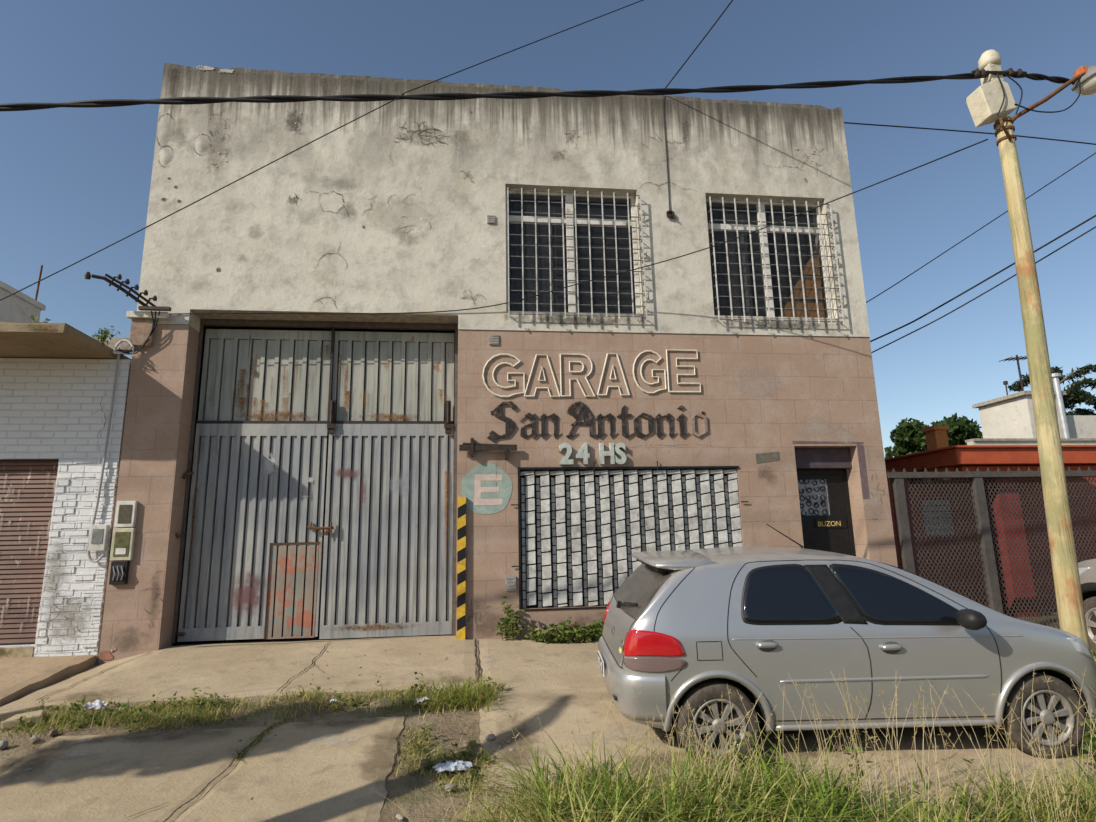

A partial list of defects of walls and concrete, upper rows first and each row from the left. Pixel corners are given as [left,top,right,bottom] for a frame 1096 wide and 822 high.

crack [292,191,349,268]